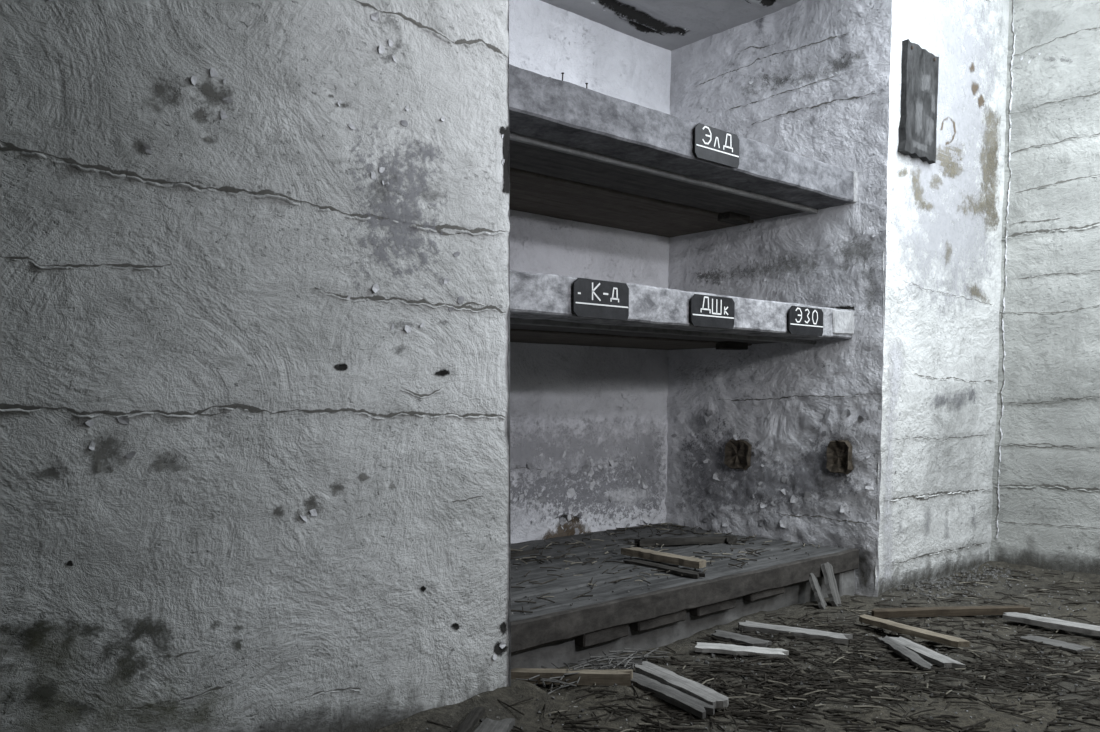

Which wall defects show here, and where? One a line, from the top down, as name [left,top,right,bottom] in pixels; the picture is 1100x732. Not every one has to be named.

crack [355,0,508,60]
crack [698,32,852,86]
crack [725,74,875,128]
corrosion [970,62,984,107]
crack [0,140,505,237]
crack [883,0,1100,564]
crack [0,387,505,430]
crack [718,393,875,402]
crack [770,511,871,525]
leakage [1,619,53,648]
leakage [63,617,172,681]